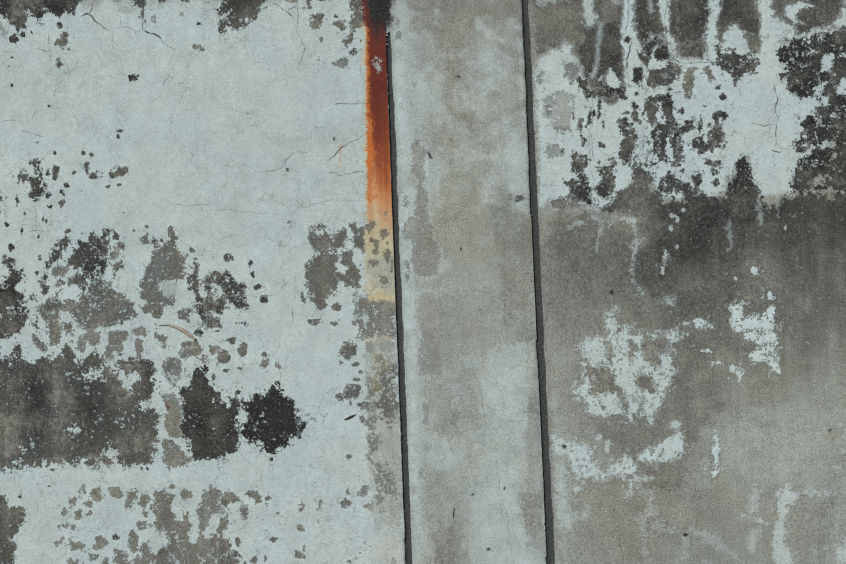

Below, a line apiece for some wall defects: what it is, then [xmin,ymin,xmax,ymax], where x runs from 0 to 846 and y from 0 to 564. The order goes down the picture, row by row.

peeling [114,127,126,141]
peeling [124,71,144,85]
corrosion [359,0,395,305]
damp [389,0,408,43]
peeling [532,0,846,210]
peeling [0,138,317,564]
peeling [297,218,397,426]
damp [485,0,846,564]
peeling [292,479,371,562]
damp [432,518,459,564]